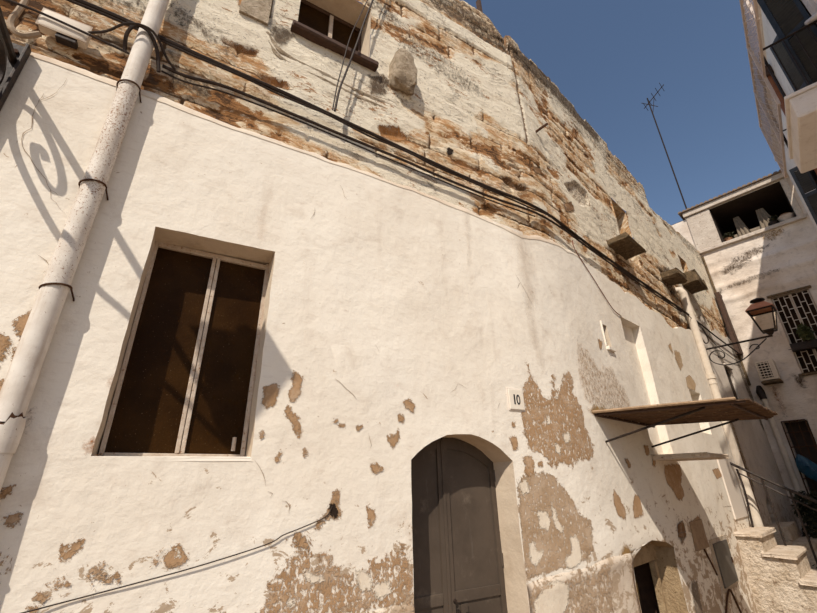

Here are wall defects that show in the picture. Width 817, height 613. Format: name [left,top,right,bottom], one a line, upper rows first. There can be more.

spalling [221,37,259,57]
crack [21,79,67,207]
spalling [446,147,491,177]
peeling [0,309,32,368]
peeling [261,370,303,438]
peeling [386,398,415,448]
peeling [509,348,630,613]
peeling [25,575,71,613]
peeling [58,538,85,562]
peeling [85,561,122,597]
peeling [149,543,189,568]
peeling [260,488,414,613]